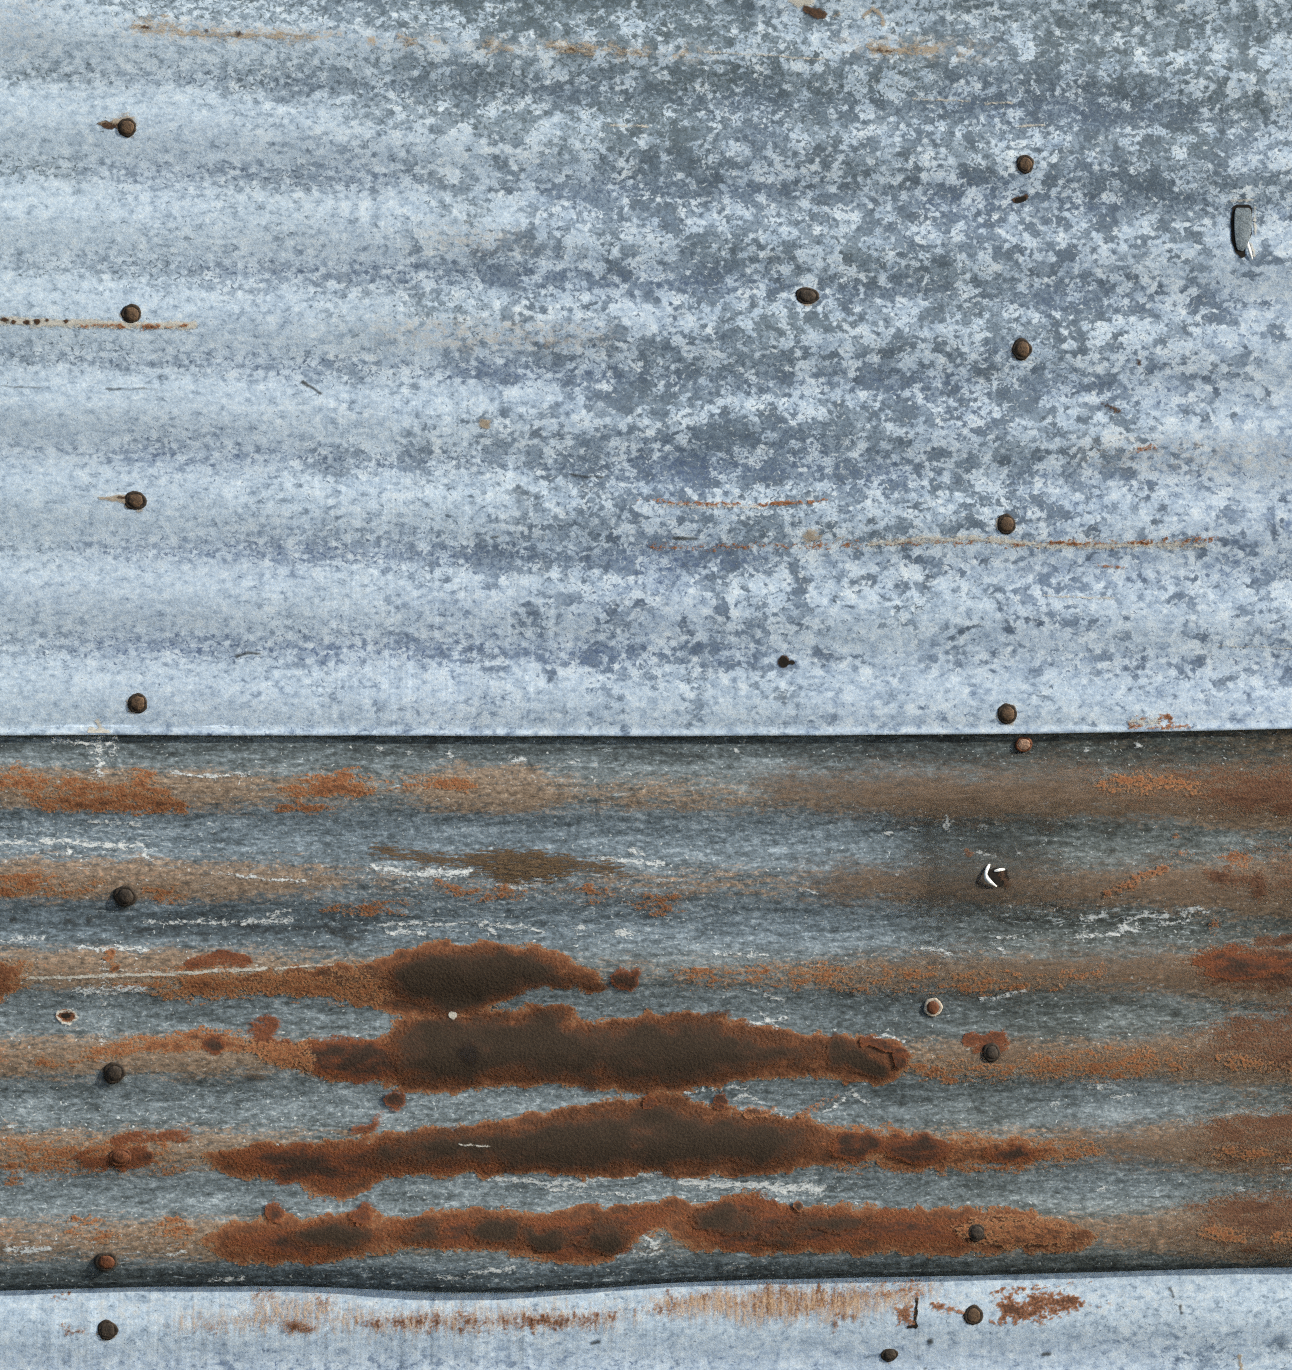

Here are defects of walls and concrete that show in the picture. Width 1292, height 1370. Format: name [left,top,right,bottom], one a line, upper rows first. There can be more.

corrosion [0,316,197,331]
corrosion [52,737,112,747]
corrosion [0,760,251,861]
corrosion [269,766,478,815]
corrosion [1078,747,1292,818]
corrosion [0,833,1292,1282]
corrosion [236,1288,617,1335]
corrosion [635,1279,965,1333]
corrosion [989,1282,1085,1326]